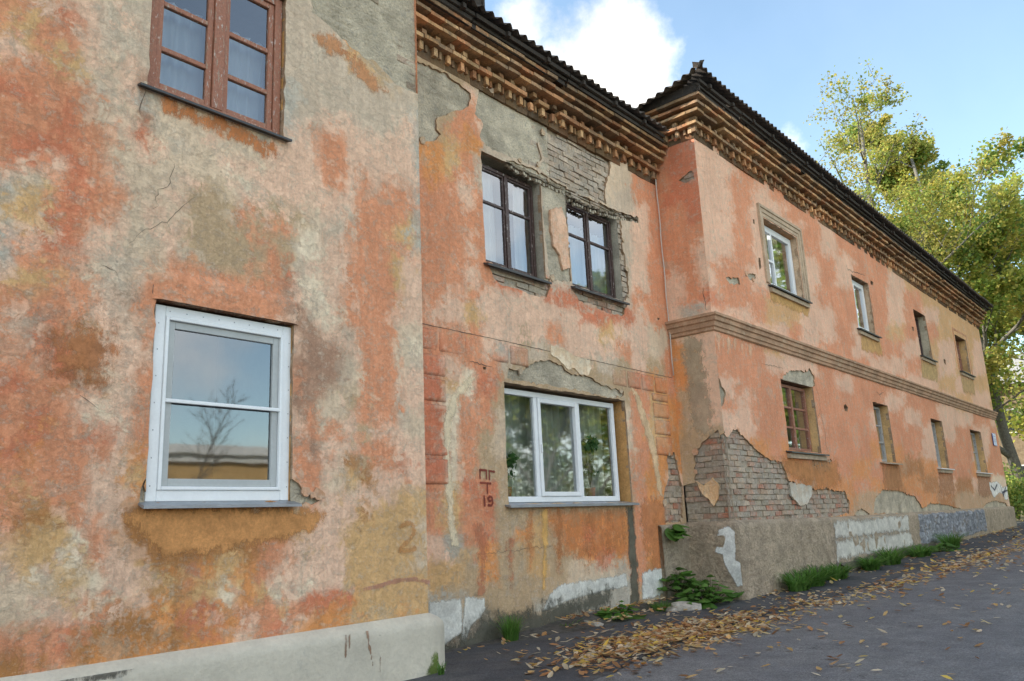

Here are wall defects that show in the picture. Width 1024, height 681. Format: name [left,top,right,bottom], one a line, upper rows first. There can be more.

spalling [311,0,629,316]
crack [130,166,195,243]
spalling [507,345,624,404]
damp [121,506,327,559]
spalling [290,479,325,504]
spalling [662,428,959,586]